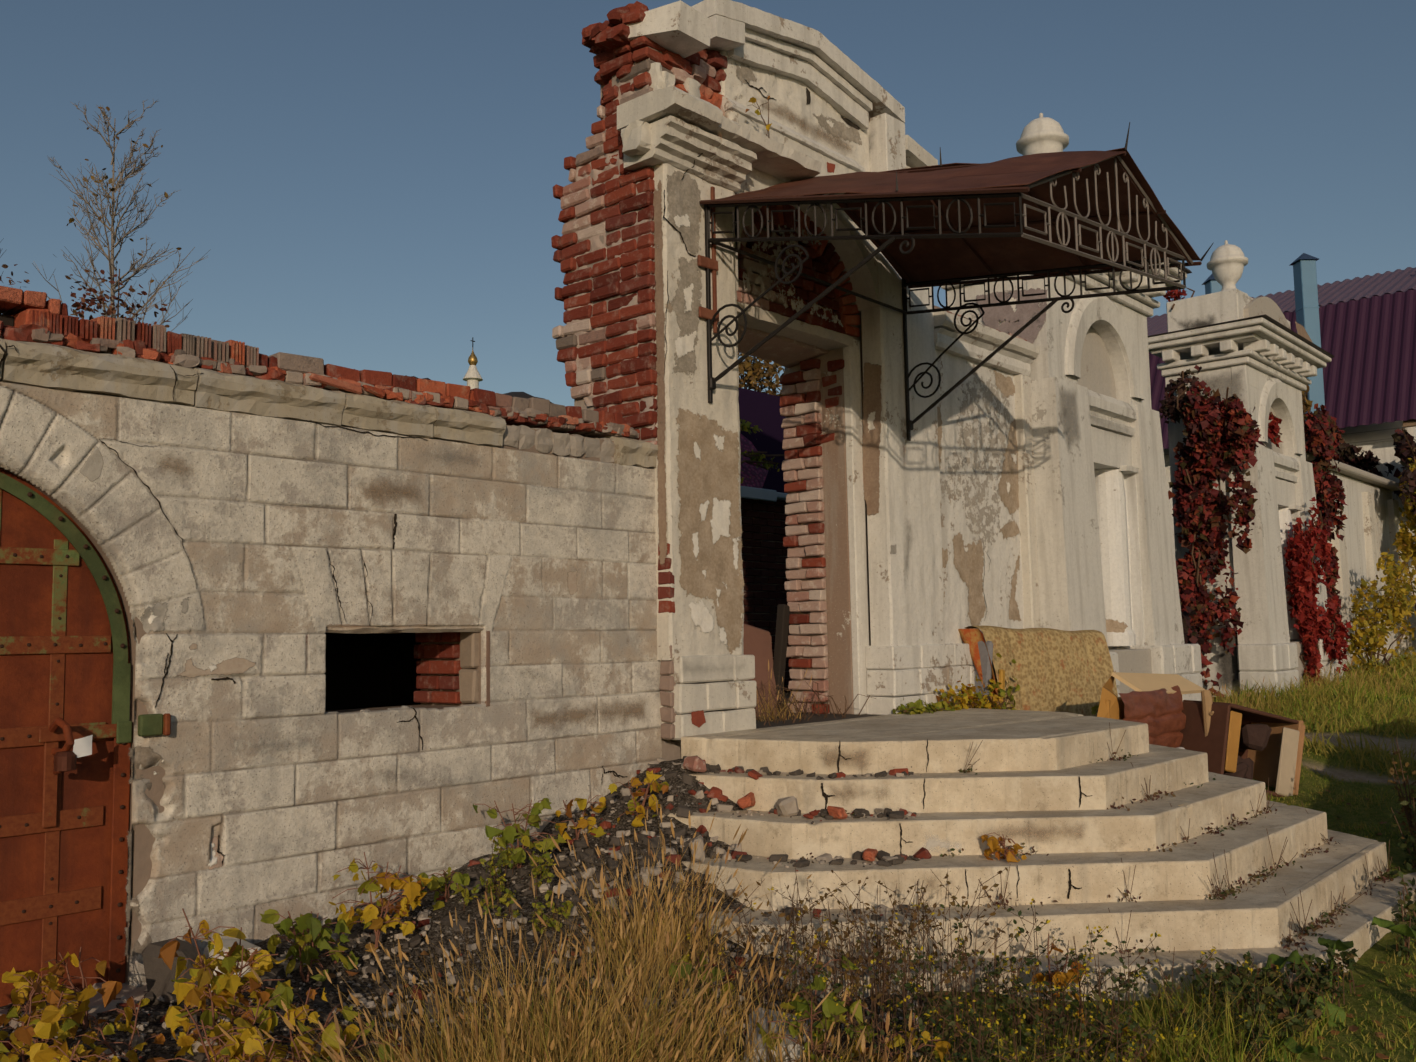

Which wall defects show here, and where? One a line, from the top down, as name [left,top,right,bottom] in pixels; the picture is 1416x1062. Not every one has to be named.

spalling [582,6,649,53]
peeling [653,171,745,654]
peeling [937,370,1021,629]
crack [327,549,373,621]
crack [155,633,178,707]
spalling [128,746,165,790]
crack [821,741,851,809]
spalling [208,837,224,870]
spalling [125,829,152,956]